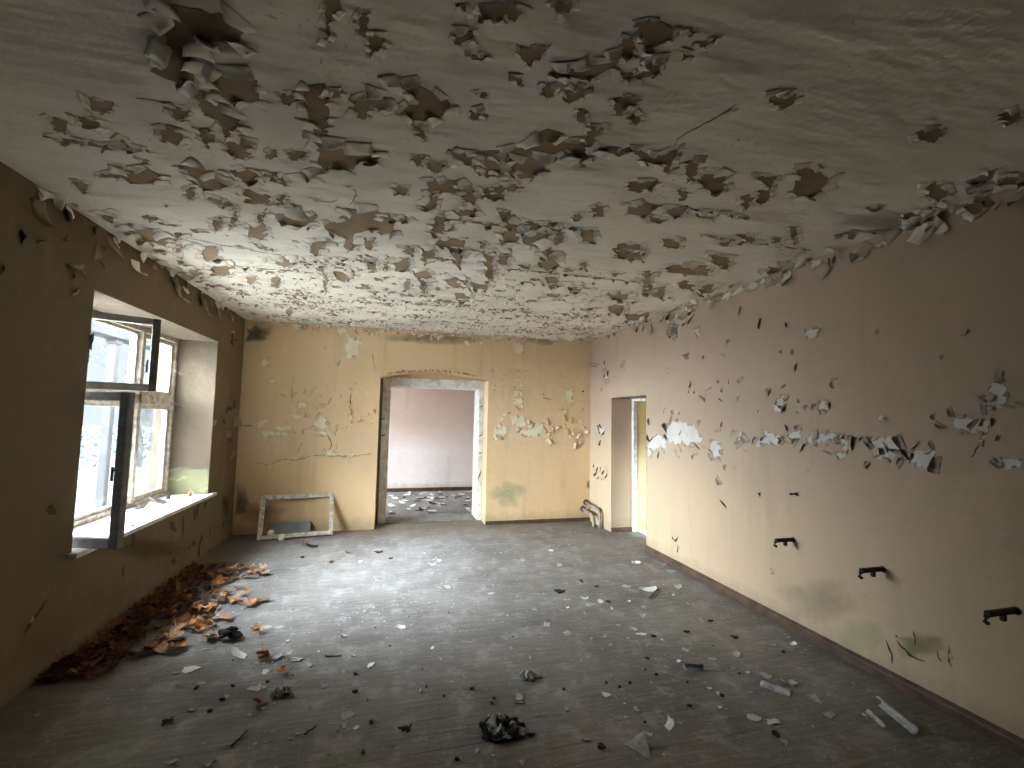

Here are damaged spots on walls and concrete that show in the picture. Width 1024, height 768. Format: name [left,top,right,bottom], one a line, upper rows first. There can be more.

crack [674,105,739,150]
peeling [30,0,1024,368]
peeling [255,378,377,460]
crack [253,418,384,468]
peeling [491,366,605,449]
peeling [646,377,942,485]
peeling [930,379,1024,442]
peeling [989,456,1024,469]